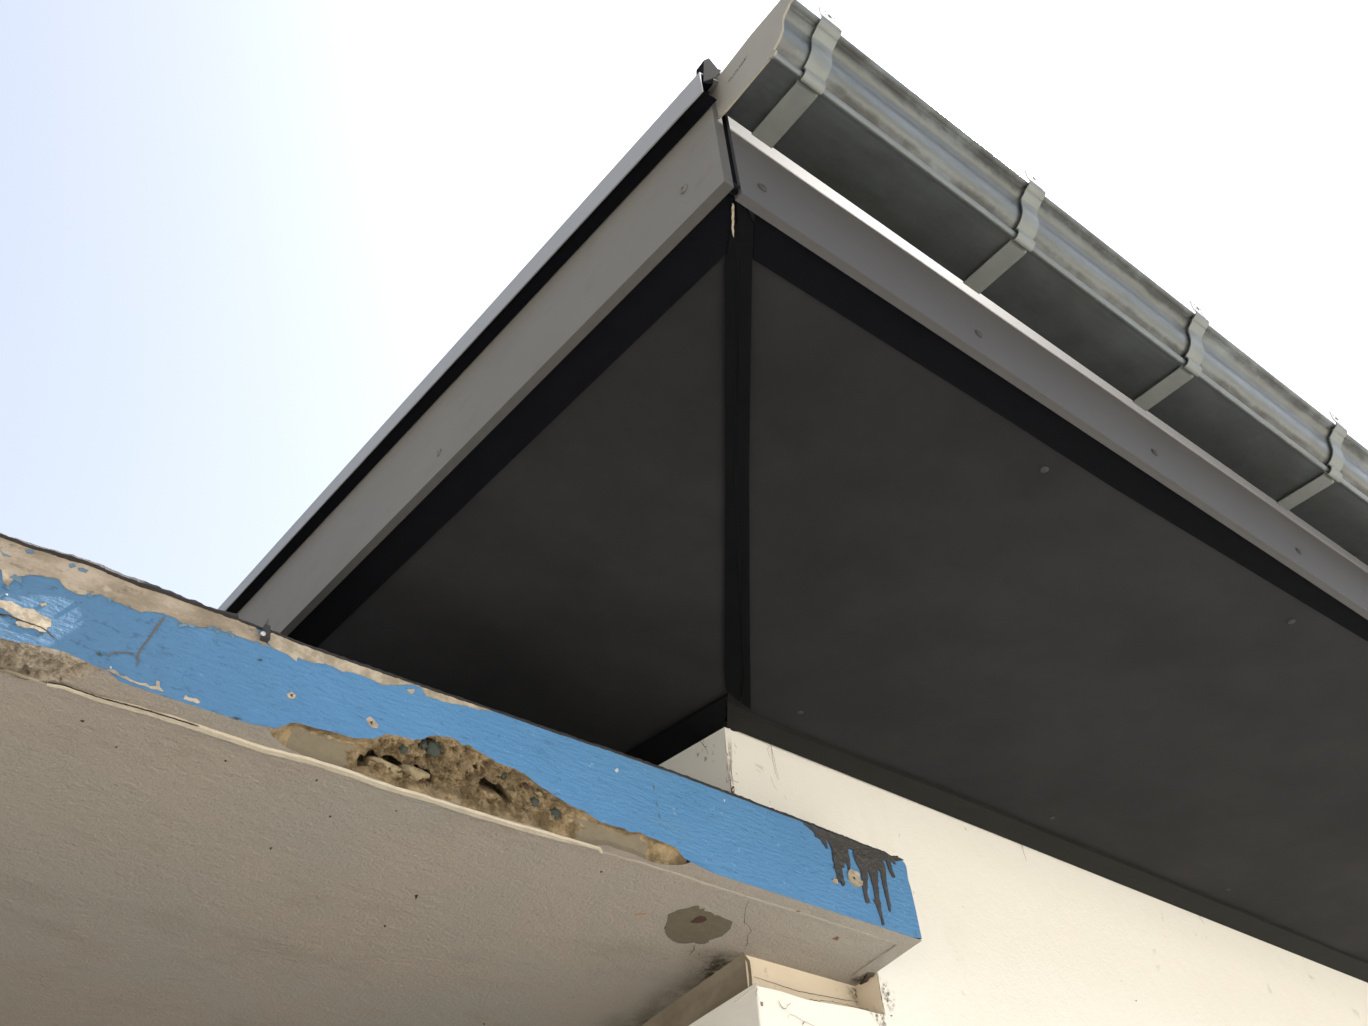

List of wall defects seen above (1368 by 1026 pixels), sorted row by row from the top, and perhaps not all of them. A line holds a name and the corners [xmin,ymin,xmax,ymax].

peeling [0,537,491,711]
spalling [268,717,687,865]
peeling [664,906,733,944]